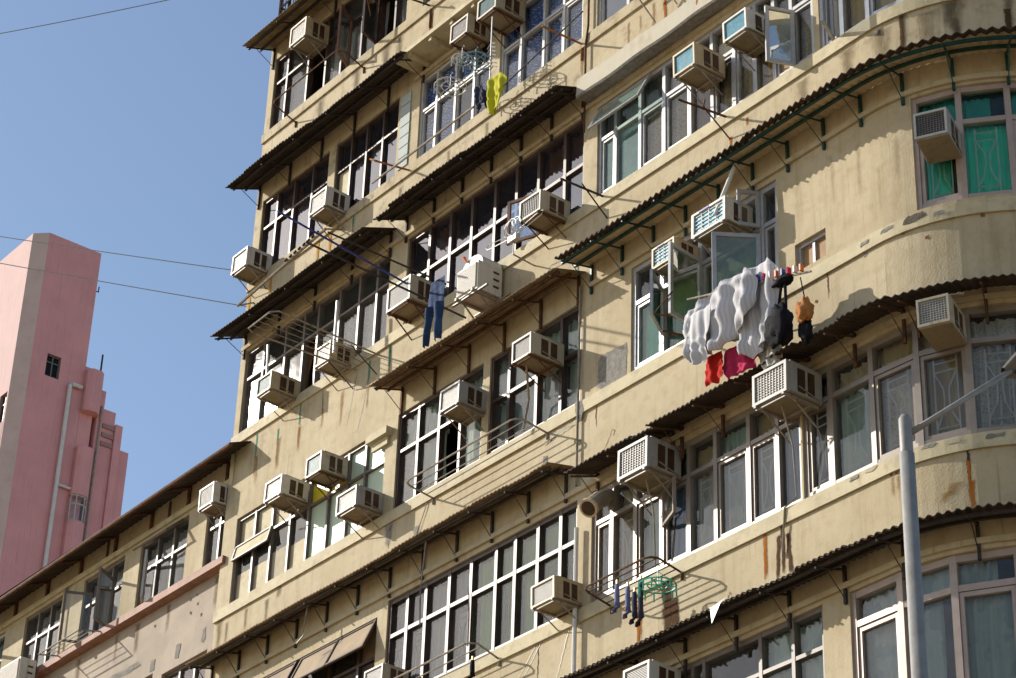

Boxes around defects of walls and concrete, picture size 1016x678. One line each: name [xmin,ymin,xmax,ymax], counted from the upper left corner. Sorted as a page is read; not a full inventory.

rust [966,460,976,508]